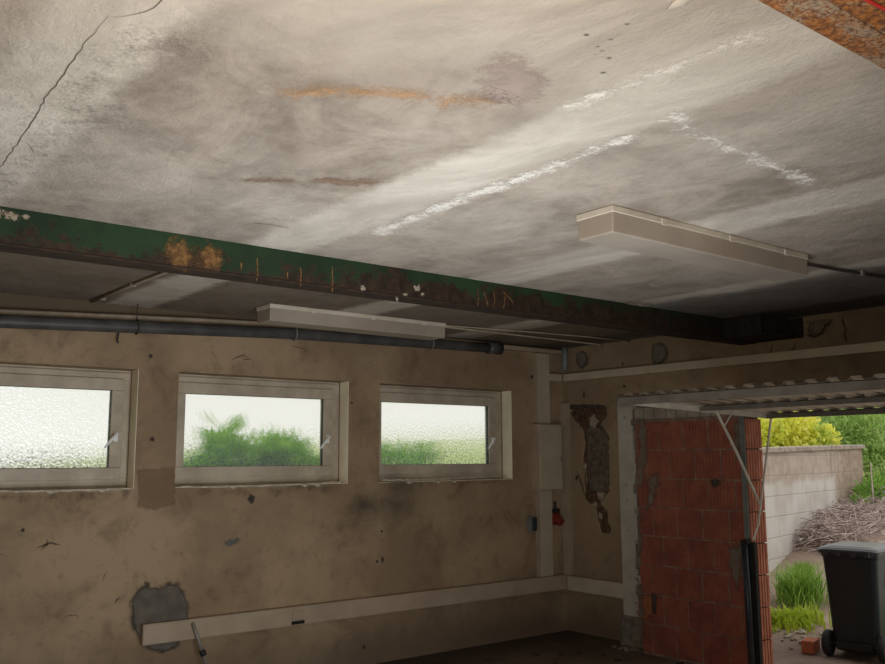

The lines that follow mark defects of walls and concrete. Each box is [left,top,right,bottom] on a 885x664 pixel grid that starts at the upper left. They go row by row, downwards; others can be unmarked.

crack [0,0,162,167]
rust [314,178,378,186]
peeling [0,210,30,220]
rust [164,238,222,271]
flaking render [570,393,611,534]